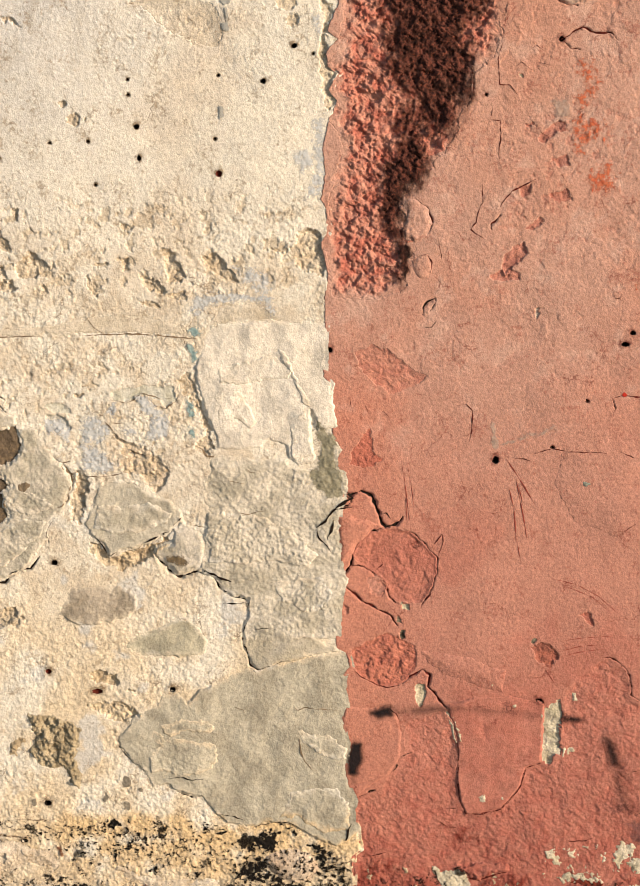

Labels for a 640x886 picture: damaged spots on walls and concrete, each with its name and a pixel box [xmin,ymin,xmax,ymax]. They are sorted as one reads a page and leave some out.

crack [498,43,549,94]
crack [562,26,618,50]
damp [373,0,488,283]
peeling [85,248,276,316]
spalling [0,426,21,465]
peeling [44,372,215,525]
spalling [89,536,170,572]
crack [316,490,444,626]
peeling [149,719,218,777]
spalling [280,527,640,886]
crack [440,743,540,828]
damp [0,801,447,886]